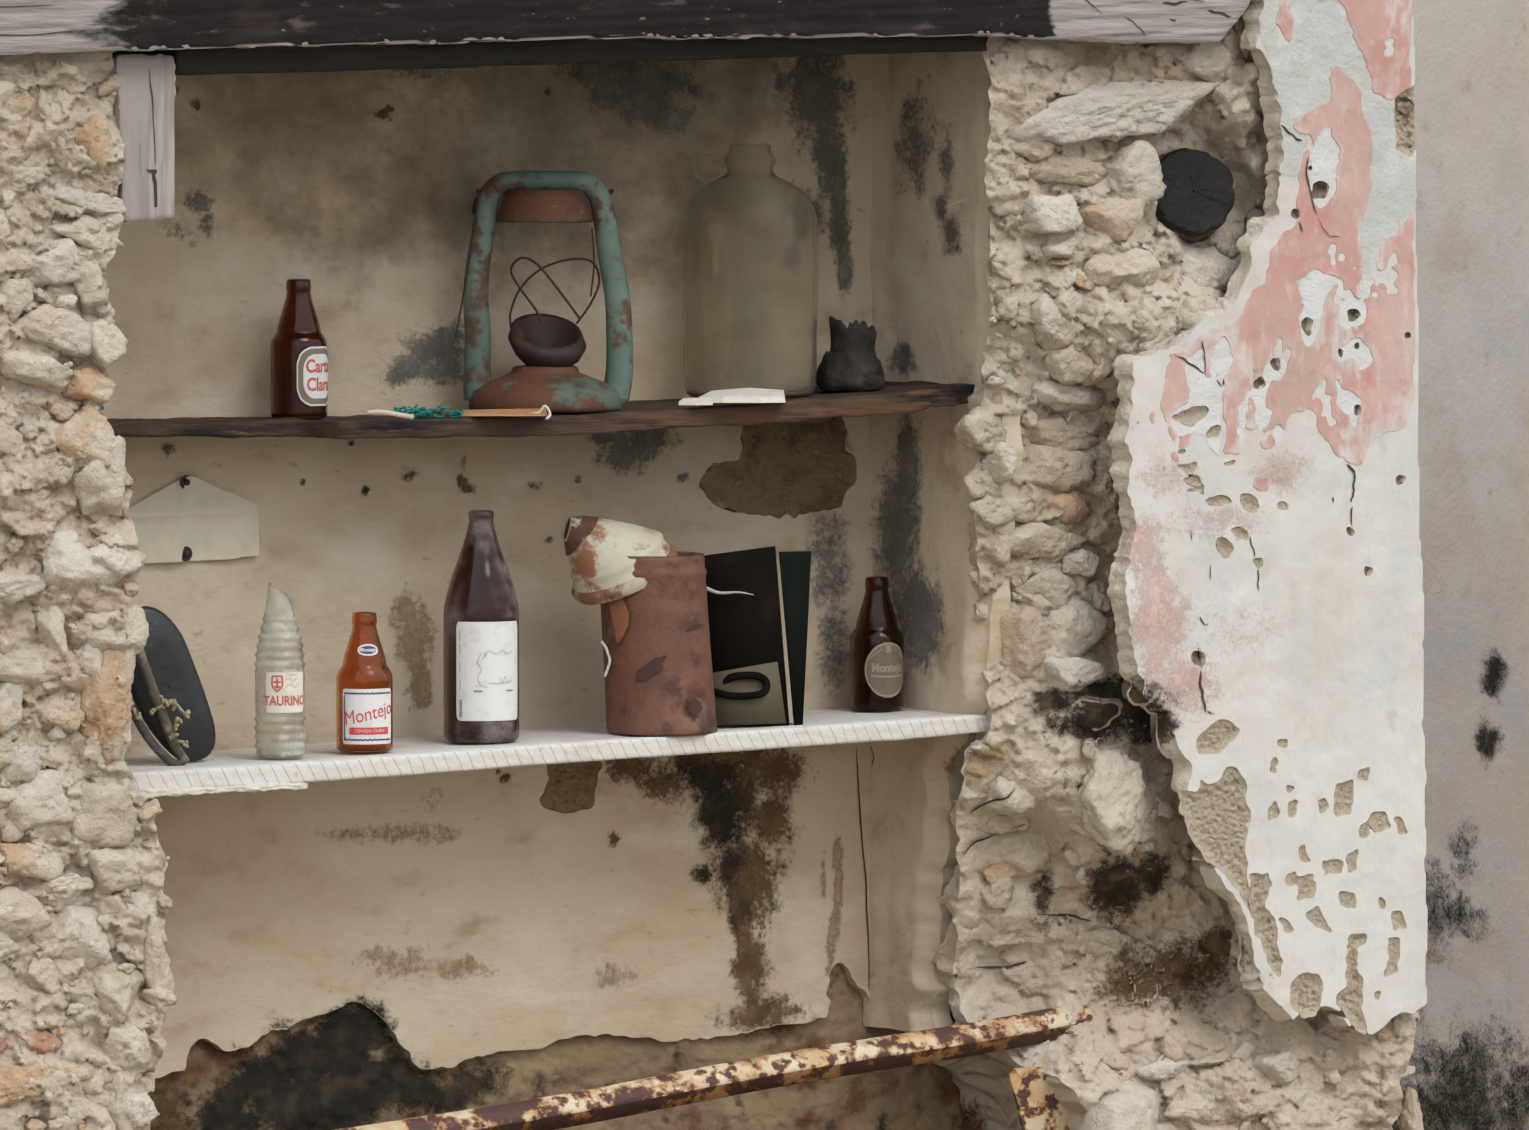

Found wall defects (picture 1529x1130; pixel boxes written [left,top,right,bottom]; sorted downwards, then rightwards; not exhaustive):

water stain [895,97,961,253]
peeling [1260,0,1417,369]
flaking render [699,416,856,518]
peeling [1144,337,1308,559]
peeling [1336,379,1361,427]
peeling [1124,524,1211,717]
mould [1475,723,1505,761]
mould [1480,650,1507,697]
water stain [605,748,806,1037]
flaking render [1178,720,1407,1035]
water stain [1426,827,1482,963]
water stain [1392,1009,1529,1130]